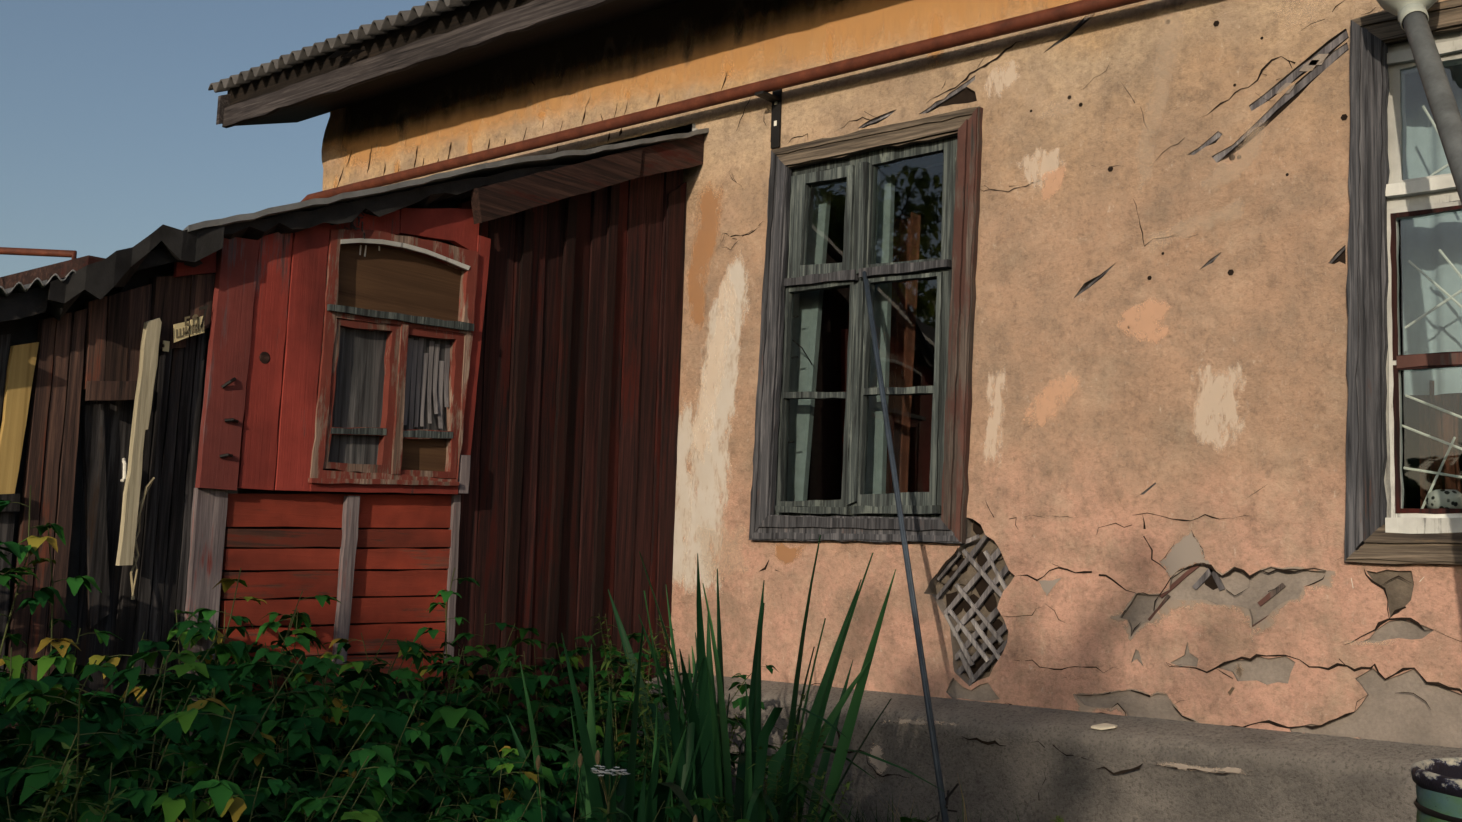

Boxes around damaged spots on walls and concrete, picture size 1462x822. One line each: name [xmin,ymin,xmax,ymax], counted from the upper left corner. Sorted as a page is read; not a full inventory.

leakage [343,0,1006,172]
crack [929,37,1027,101]
crack [1081,0,1376,159]
crack [1133,199,1198,247]
peeling [672,259,748,597]
peeling [1195,366,1243,447]
spalling [924,518,1015,701]
spalling [1111,531,1335,667]
spalling [1361,570,1433,643]
spalling [1073,689,1199,730]
spalling [1219,656,1295,685]
spalling [1289,668,1462,748]